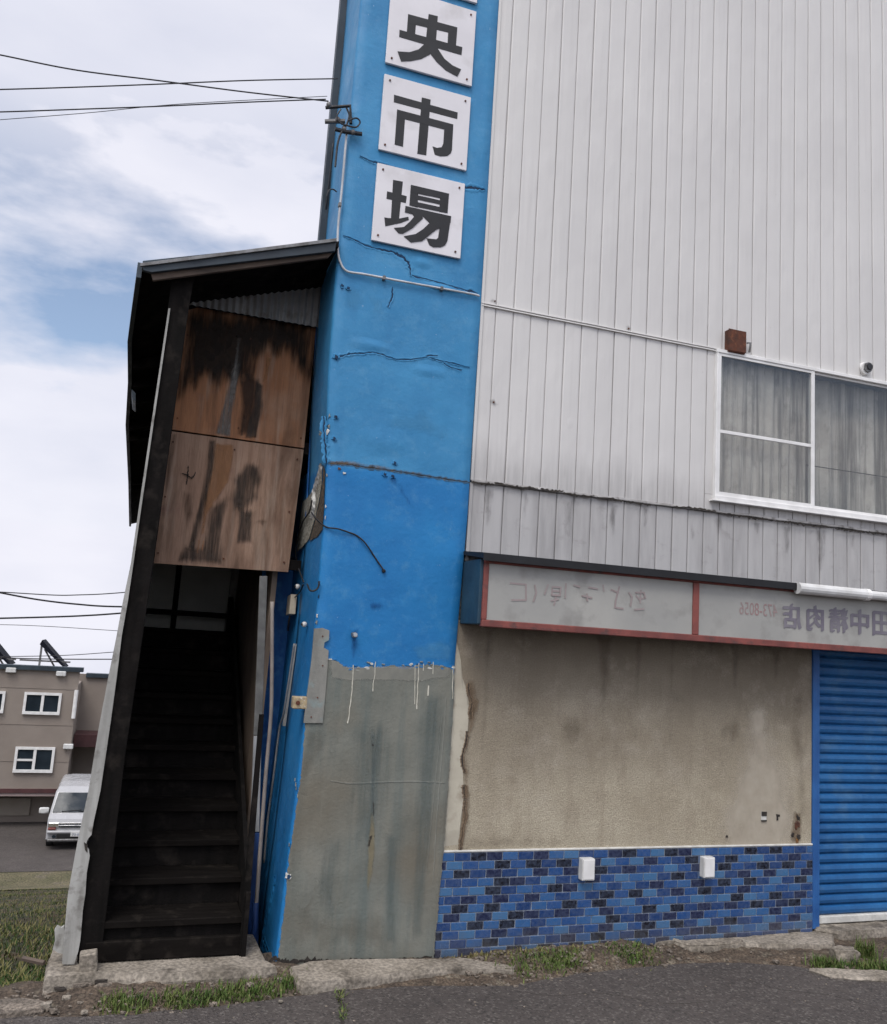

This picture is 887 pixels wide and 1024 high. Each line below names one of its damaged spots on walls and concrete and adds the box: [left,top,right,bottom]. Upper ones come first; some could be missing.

crack [343,235,478,308]
crack [339,350,470,372]
damp [179,346,271,562]
spalling [297,463,327,552]
crack [319,416,887,535]
peeling [277,659,456,965]
crack [458,683,478,850]
rust [791,814,801,844]